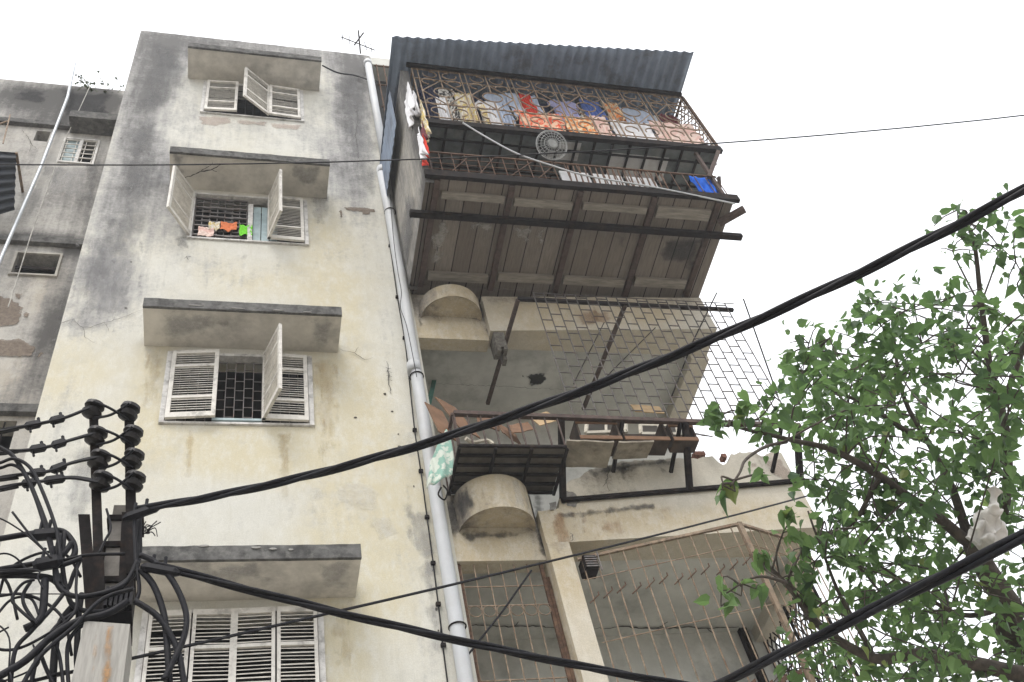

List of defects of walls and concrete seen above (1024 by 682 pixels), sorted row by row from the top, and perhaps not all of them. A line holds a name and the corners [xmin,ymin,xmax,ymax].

damp [66,93,108,113]
peeling [0,294,29,326]
peeling [0,338,43,357]
damp [527,373,546,386]
damp [448,492,511,540]